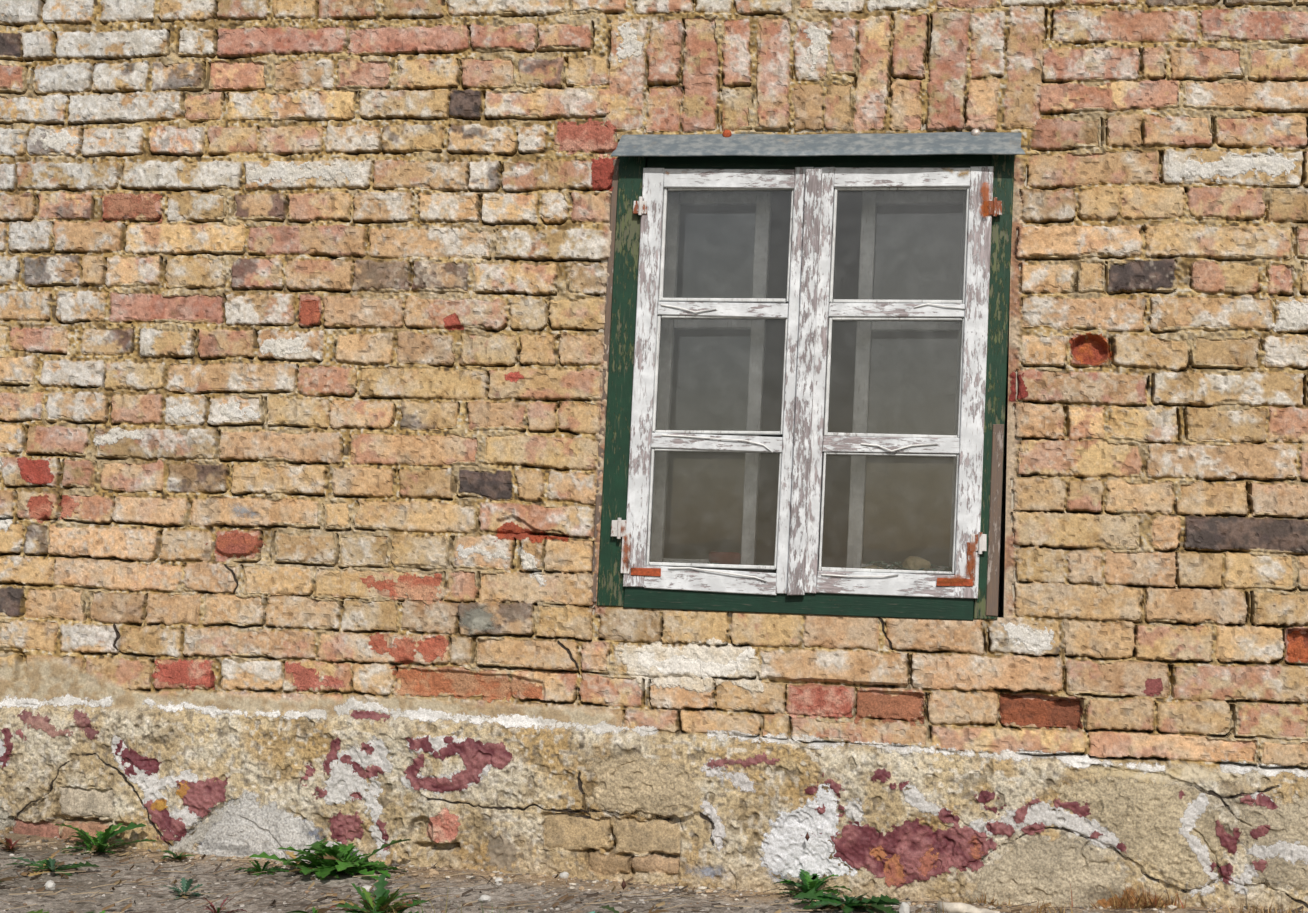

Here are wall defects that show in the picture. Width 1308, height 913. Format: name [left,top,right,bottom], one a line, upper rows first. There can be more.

peeling [661,434,773,453]
peeling [668,567,767,582]
corrosion [938,542,976,584]
peeling [0,709,229,843]
crack [13,753,237,847]
peeling [300,731,513,861]
peeling [755,768,1126,888]
crack [965,827,1308,908]
crack [1174,780,1279,822]